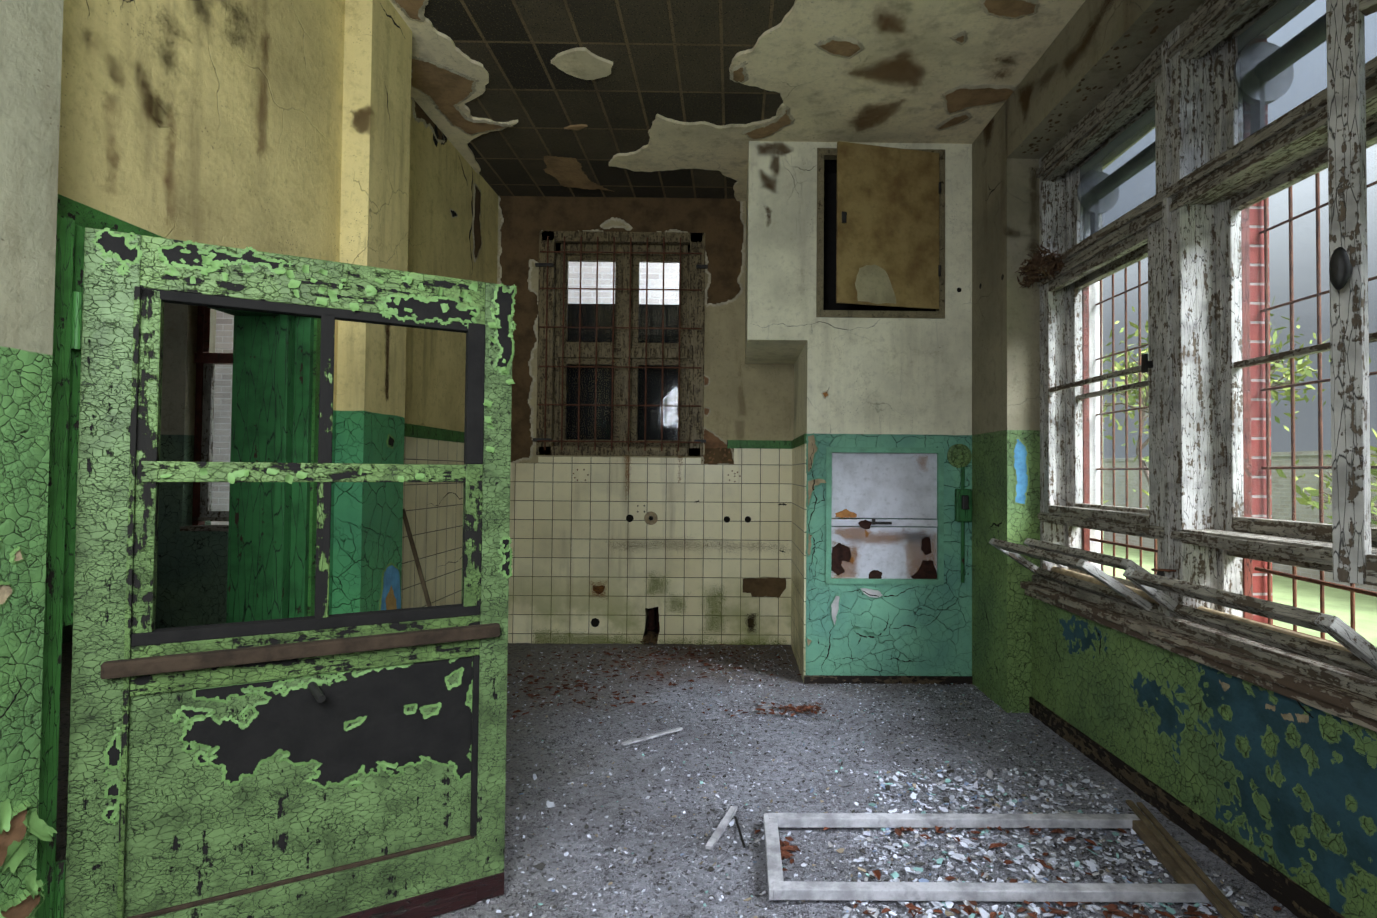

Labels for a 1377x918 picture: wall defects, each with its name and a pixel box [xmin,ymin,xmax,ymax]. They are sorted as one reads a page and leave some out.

water stain [78,0,275,227]
spalling [411,55,513,147]
spalling [551,47,613,80]
water stain [842,6,934,134]
water stain [991,0,1114,123]
peeling [1011,438,1030,507]
peeling [743,578,786,598]
rust [831,509,937,578]
crack [851,609,943,662]
crack [0,675,21,718]
peeling [1129,663,1377,915]
peeling [0,799,57,918]